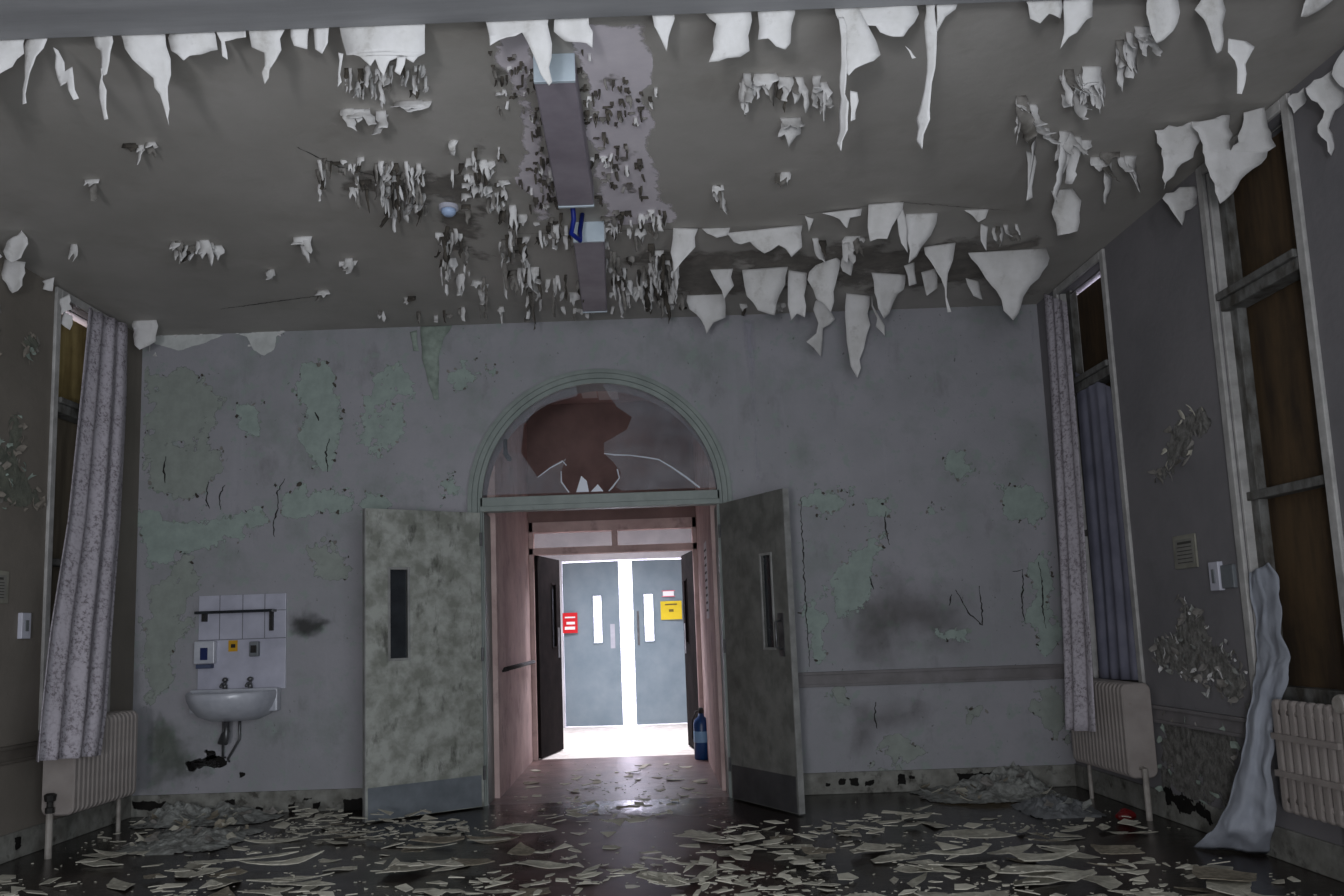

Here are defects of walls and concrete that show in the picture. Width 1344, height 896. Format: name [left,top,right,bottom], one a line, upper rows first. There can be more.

peeling [0,38,79,105]
peeling [94,24,432,135]
peeling [1026,0,1093,49]
peeling [1059,0,1254,120]
peeling [1287,50,1344,155]
peeling [1300,0,1332,17]
peeling [291,236,313,263]
peeling [315,4,1050,400]
peeling [1014,95,1140,236]
peeling [1154,107,1276,225]
peeling [132,320,286,501]
water stain [294,619,324,634]